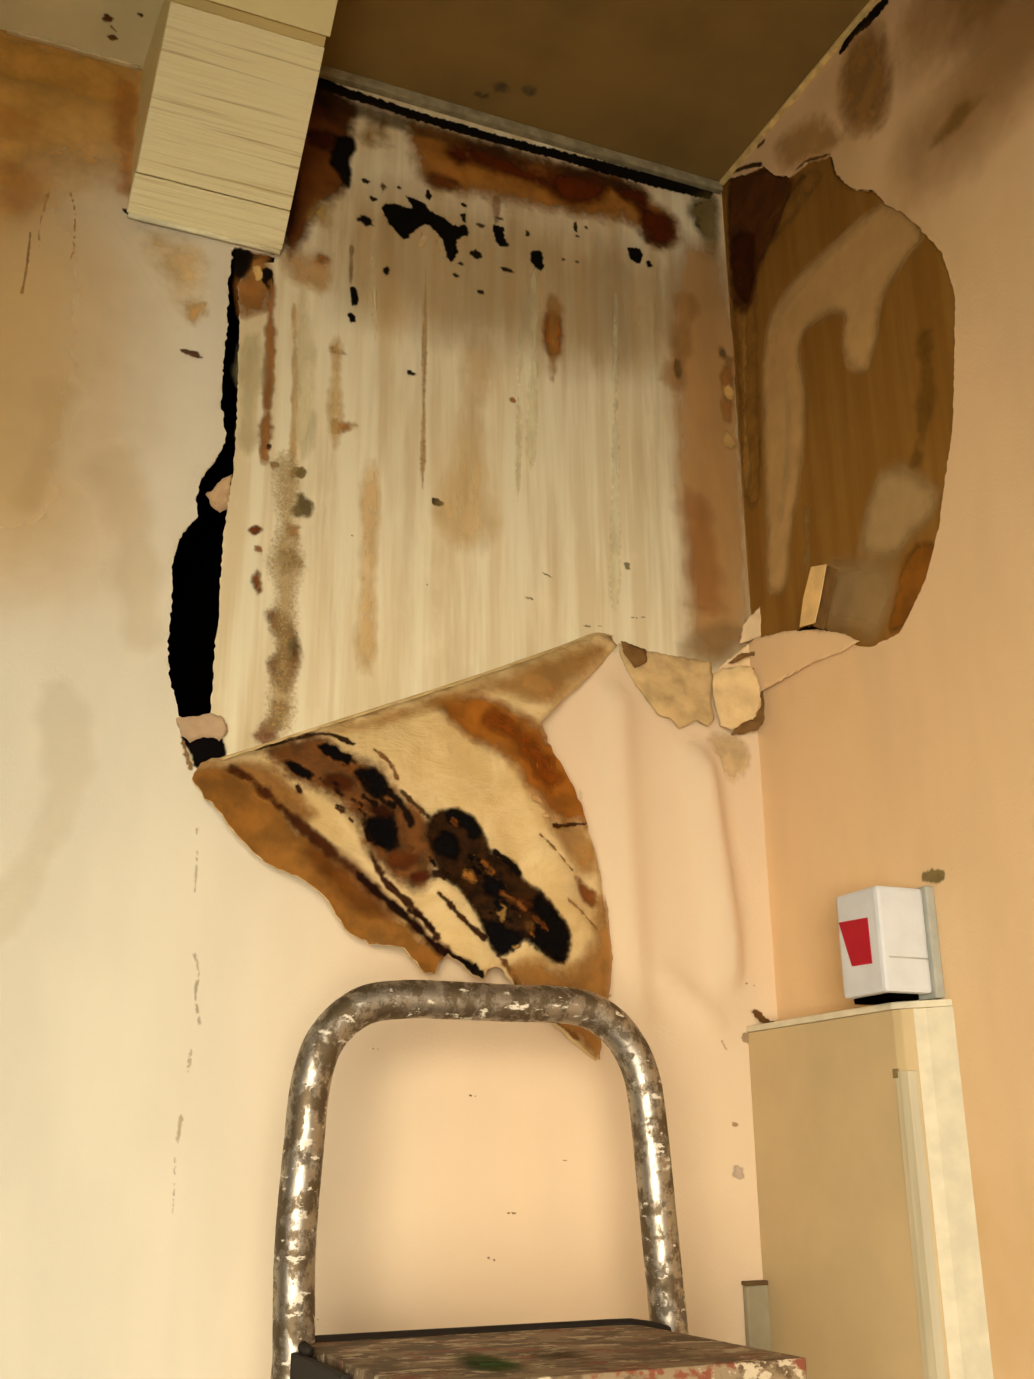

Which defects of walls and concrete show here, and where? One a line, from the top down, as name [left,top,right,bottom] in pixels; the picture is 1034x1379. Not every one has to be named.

water stain [103,14,118,41]
water stain [843,33,889,127]
water stain [0,29,142,500]
water stain [347,287,359,322]
water stain [329,136,509,277]
water stain [526,231,544,270]
water stain [627,247,652,267]
water stain [407,289,427,481]
peeling [195,83,955,756]
water stain [674,169,819,656]
water stain [712,738,747,776]